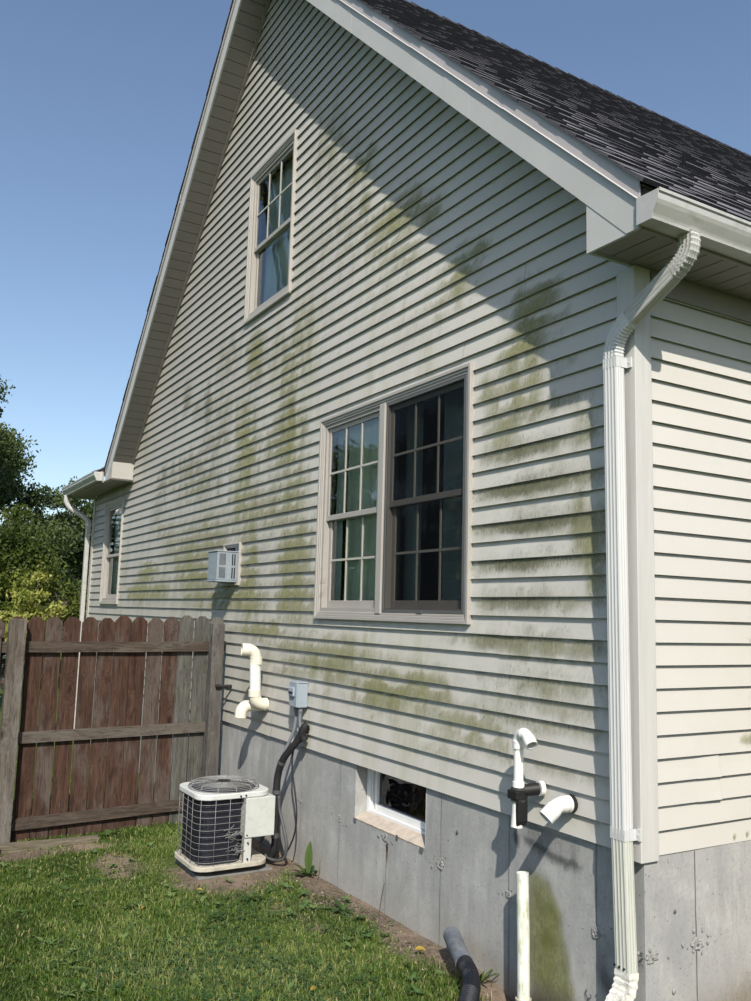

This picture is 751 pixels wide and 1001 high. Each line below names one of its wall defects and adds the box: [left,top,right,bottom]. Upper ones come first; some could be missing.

damp [372,194,439,258]
damp [483,281,559,456]
damp [171,333,354,679]
damp [490,474,569,495]
damp [484,506,602,587]
damp [477,635,594,660]
damp [353,671,449,711]